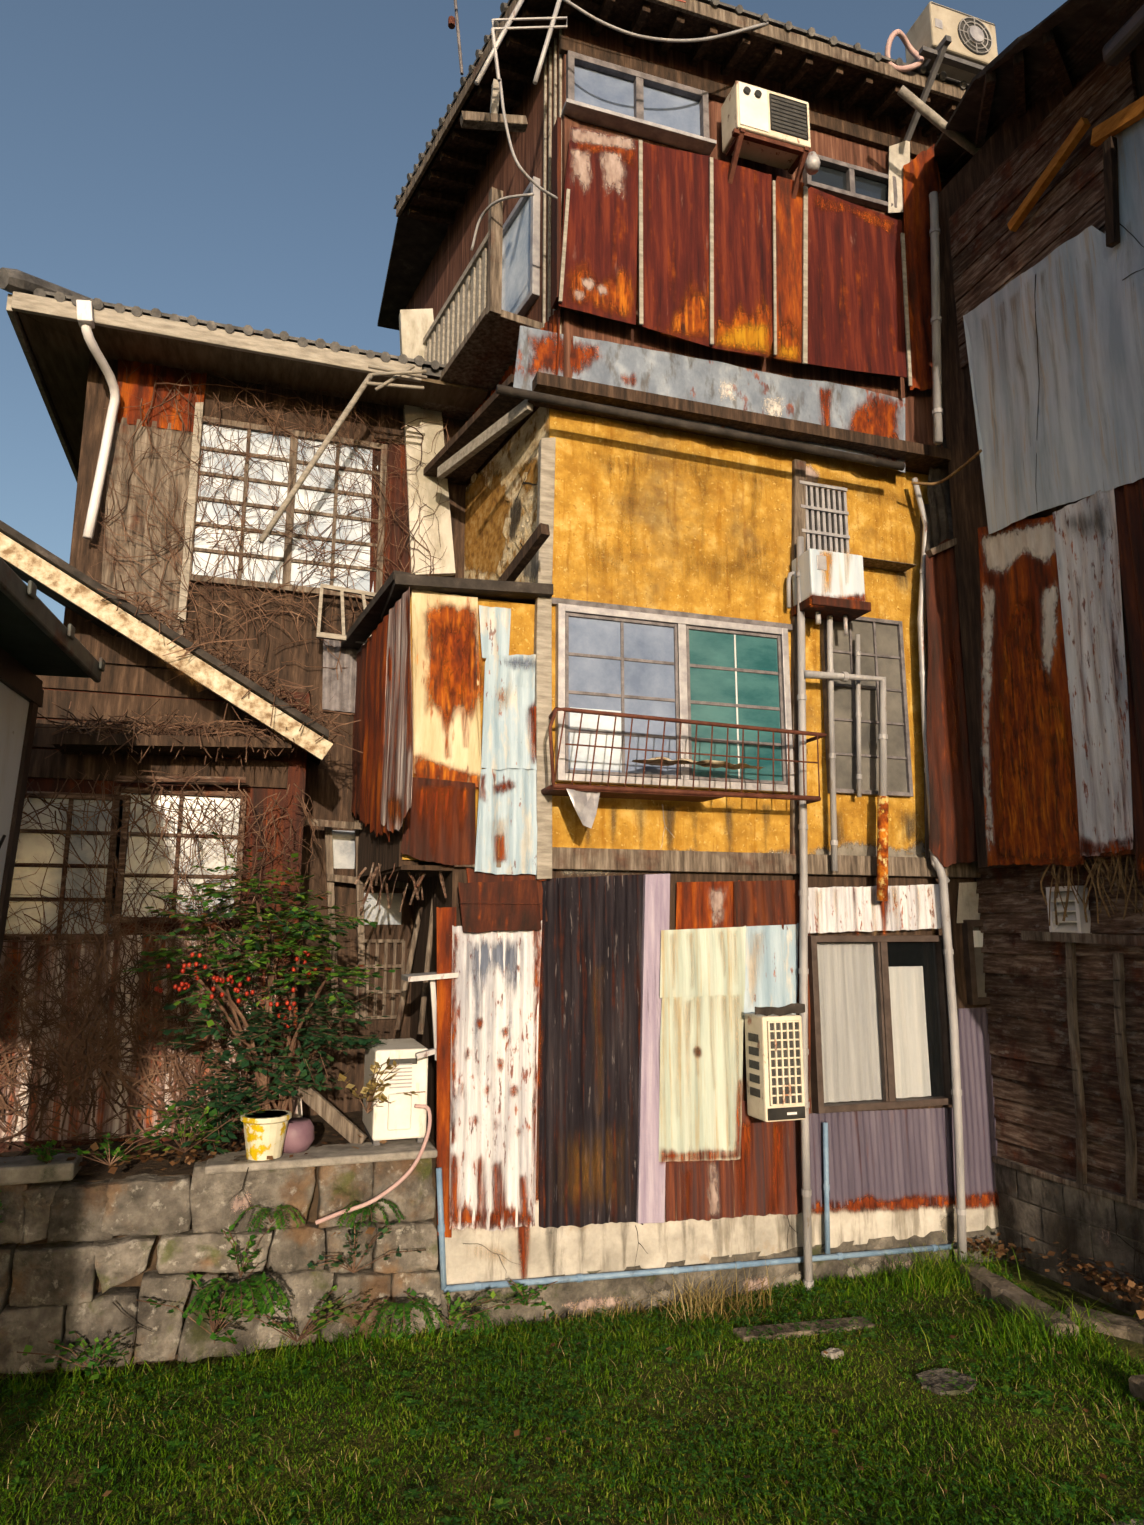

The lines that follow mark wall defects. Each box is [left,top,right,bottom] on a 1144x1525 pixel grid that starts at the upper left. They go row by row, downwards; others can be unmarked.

corrosion [528,334,599,375]
corrosion [570,268,633,314]
corrosion [672,287,799,360]
corrosion [850,396,898,438]
peeling [982,522,1056,572]
peeling [1042,587,1058,671]
corrosion [387,597,514,853]
peeling [982,587,994,843]
corrosion [998,615,1144,880]
corrosion [877,796,889,936]
corrosion [450,930,542,1279]
corrosion [662,1081,751,1216]